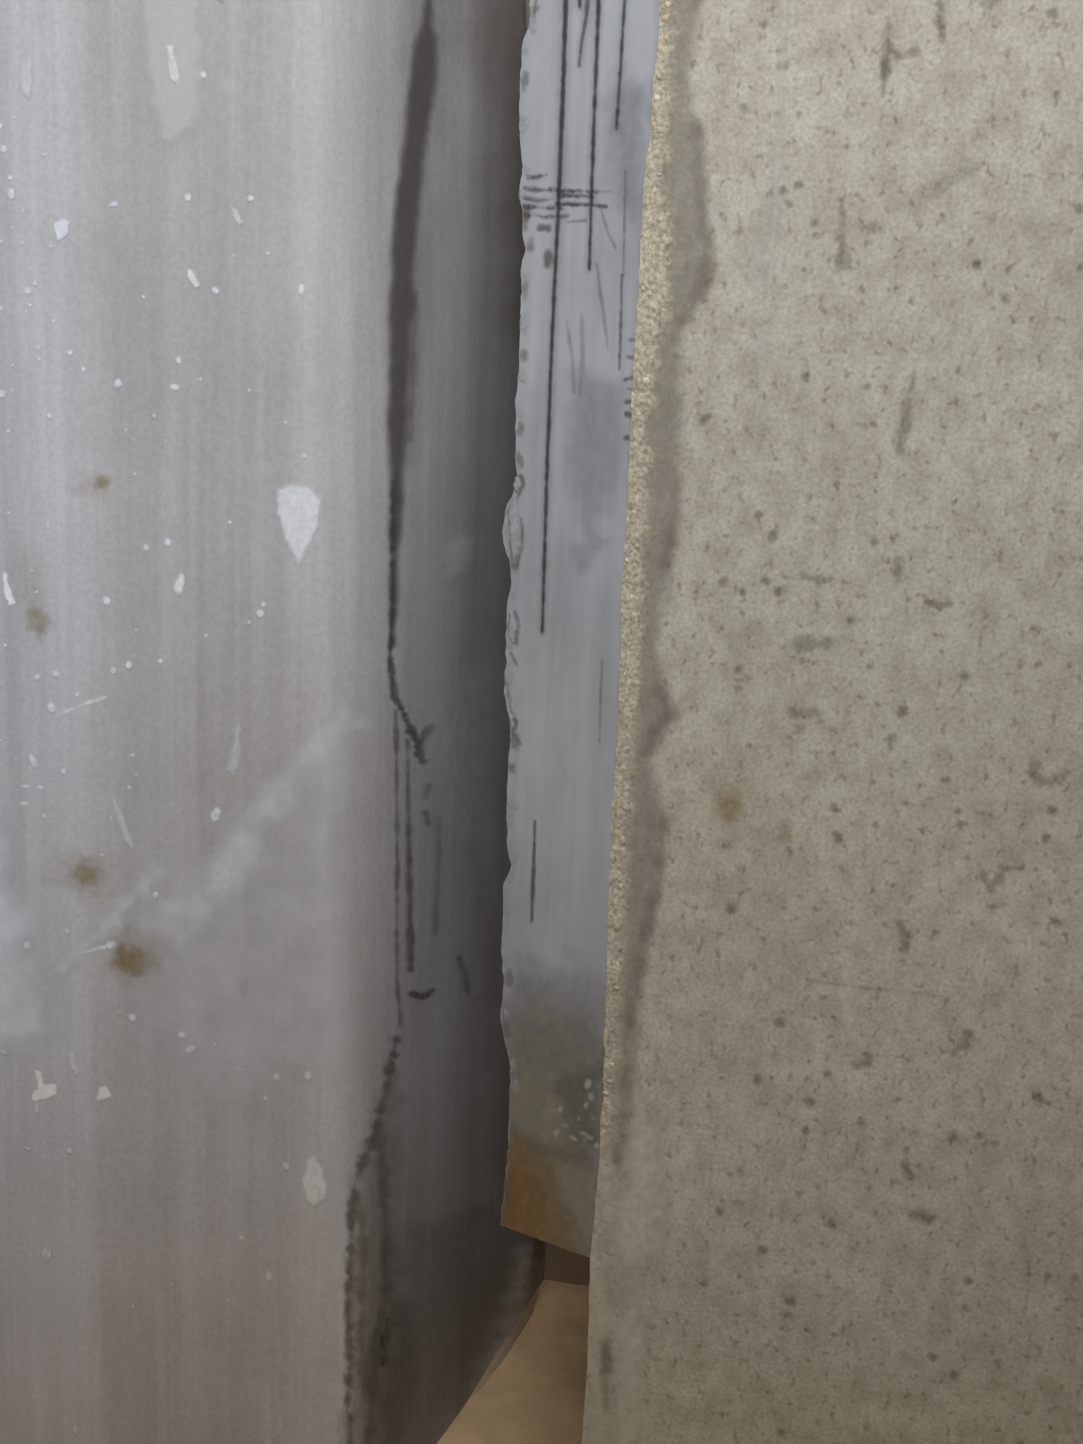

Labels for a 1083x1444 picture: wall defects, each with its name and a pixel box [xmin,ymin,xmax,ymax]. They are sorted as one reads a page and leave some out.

peeling [277,485,320,564]
water stain [0,830,44,1049]
peeling [32,1070,57,1101]
peeling [302,1156,327,1206]